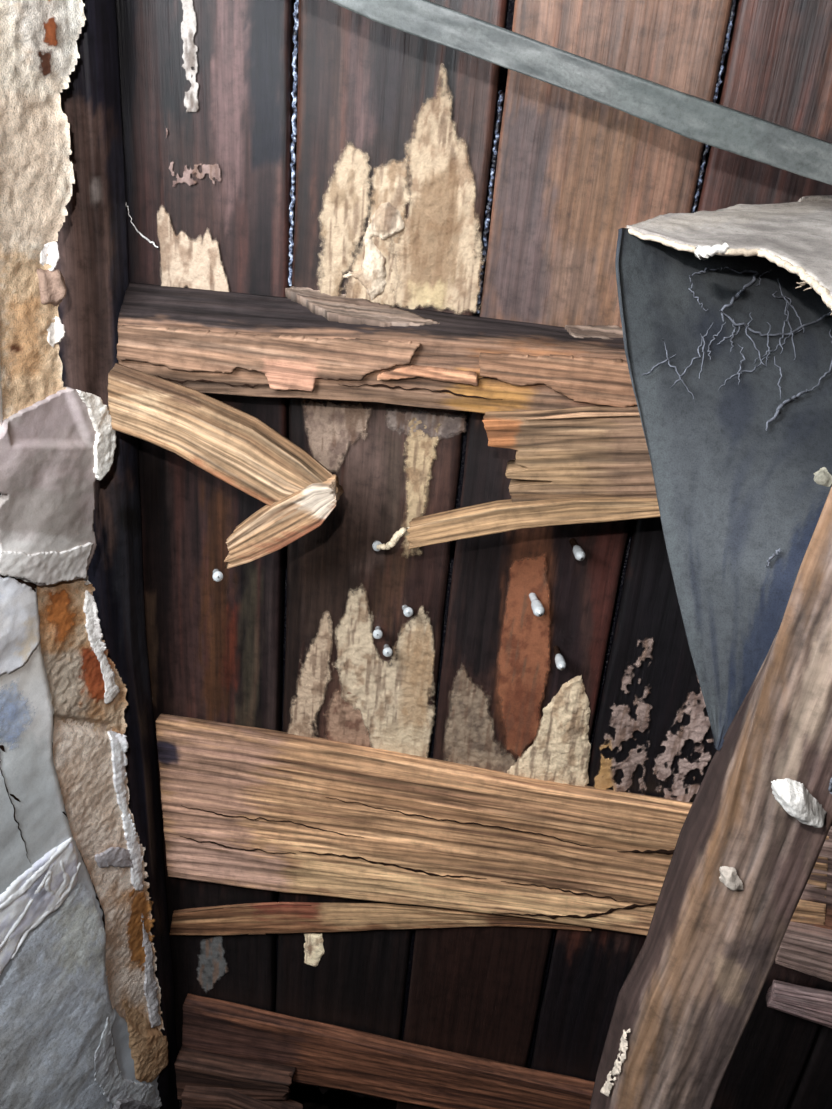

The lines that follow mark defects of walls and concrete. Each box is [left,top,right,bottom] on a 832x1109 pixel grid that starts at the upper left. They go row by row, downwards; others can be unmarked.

flaking render [0,0,168,1109]
rust [46,590,76,644]
rust [78,647,107,703]
crack [0,745,30,862]